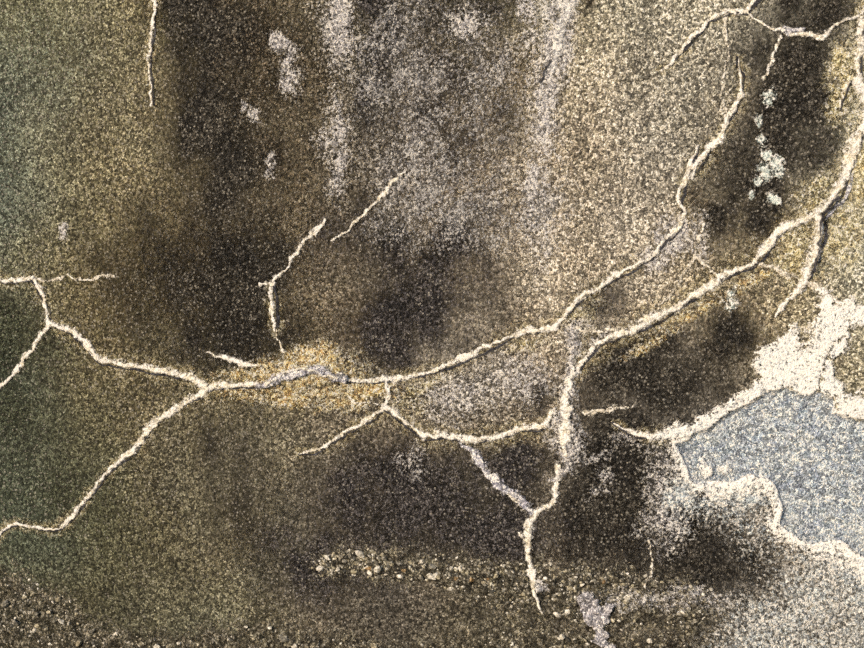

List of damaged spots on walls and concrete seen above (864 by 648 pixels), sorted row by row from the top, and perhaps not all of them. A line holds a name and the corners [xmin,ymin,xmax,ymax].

crack [146,0,157,106]
crack [539,9,565,83]
crack [660,0,864,111]
leakage [77,0,314,404]
crack [0,56,864,535]
peeling [642,286,864,585]
crack [644,540,653,588]